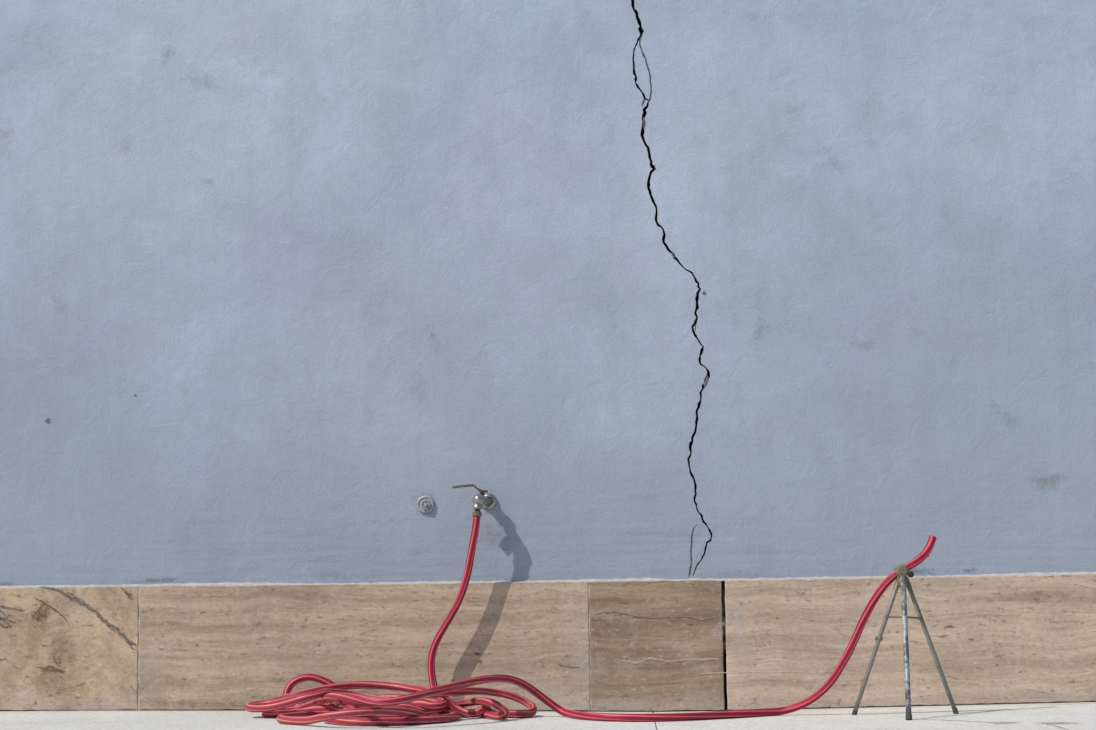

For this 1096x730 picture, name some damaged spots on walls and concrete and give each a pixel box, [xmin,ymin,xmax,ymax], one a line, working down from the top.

crack [631,0,712,576]